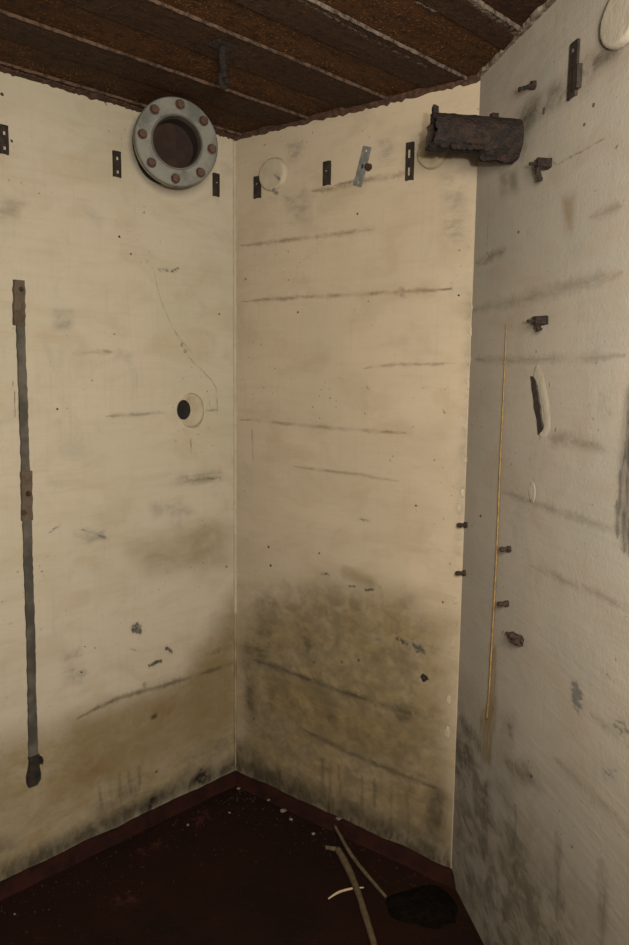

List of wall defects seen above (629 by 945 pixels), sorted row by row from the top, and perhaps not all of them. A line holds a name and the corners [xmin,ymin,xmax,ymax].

leakage [0,604,450,879]